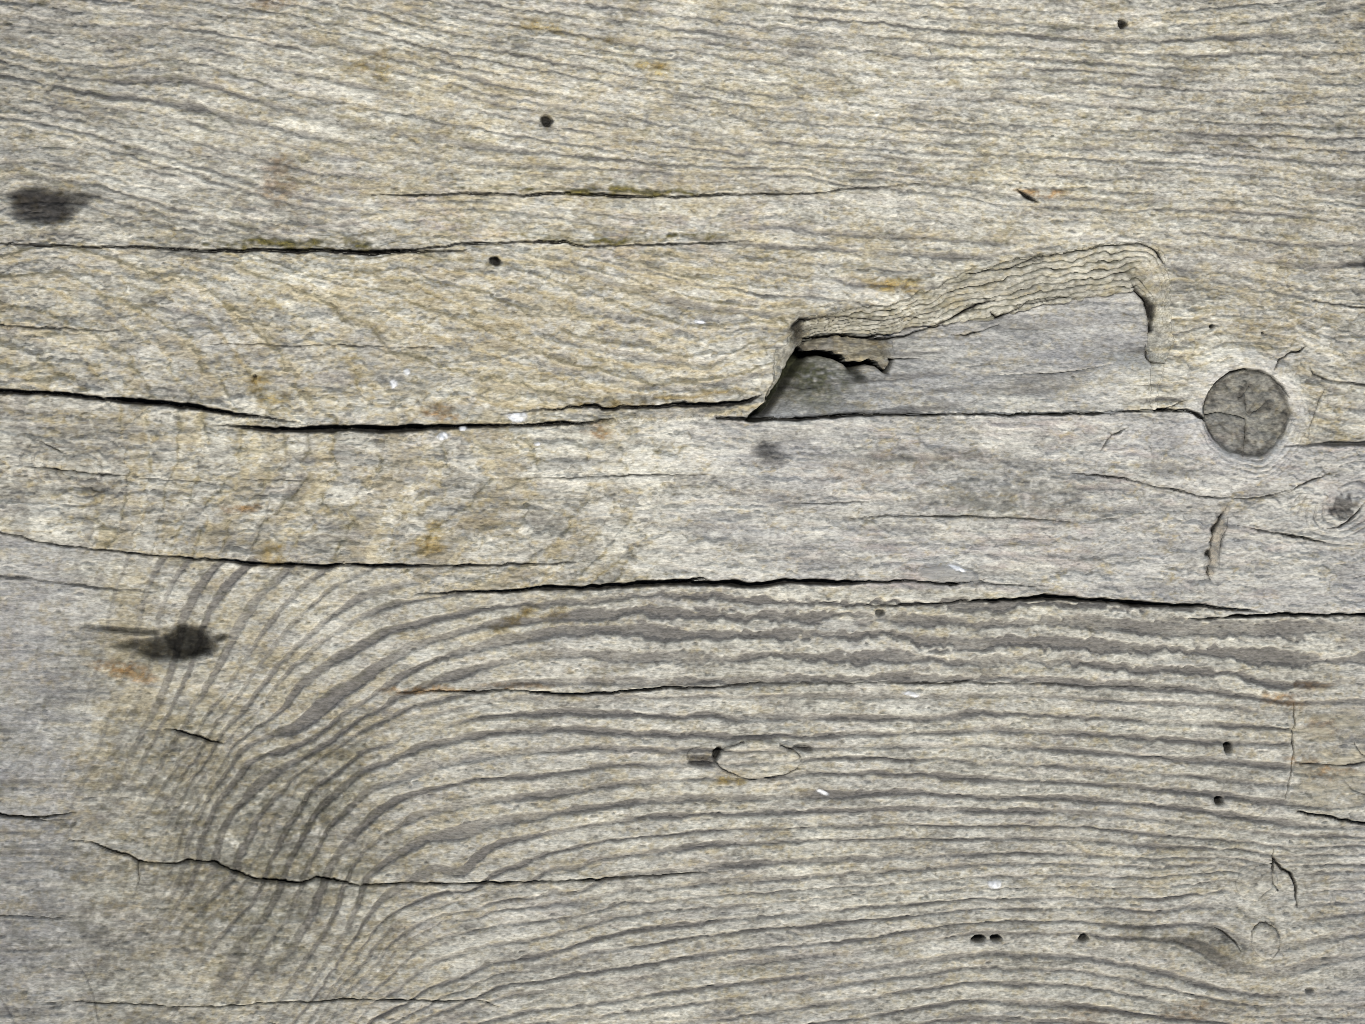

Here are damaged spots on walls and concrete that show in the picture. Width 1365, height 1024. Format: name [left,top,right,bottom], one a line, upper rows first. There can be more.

crack [0,322,61,330]
crack [0,347,1322,434]
spalling [747,349,881,419]
crack [1084,473,1127,481]
crack [49,477,1365,620]
crack [93,842,677,886]